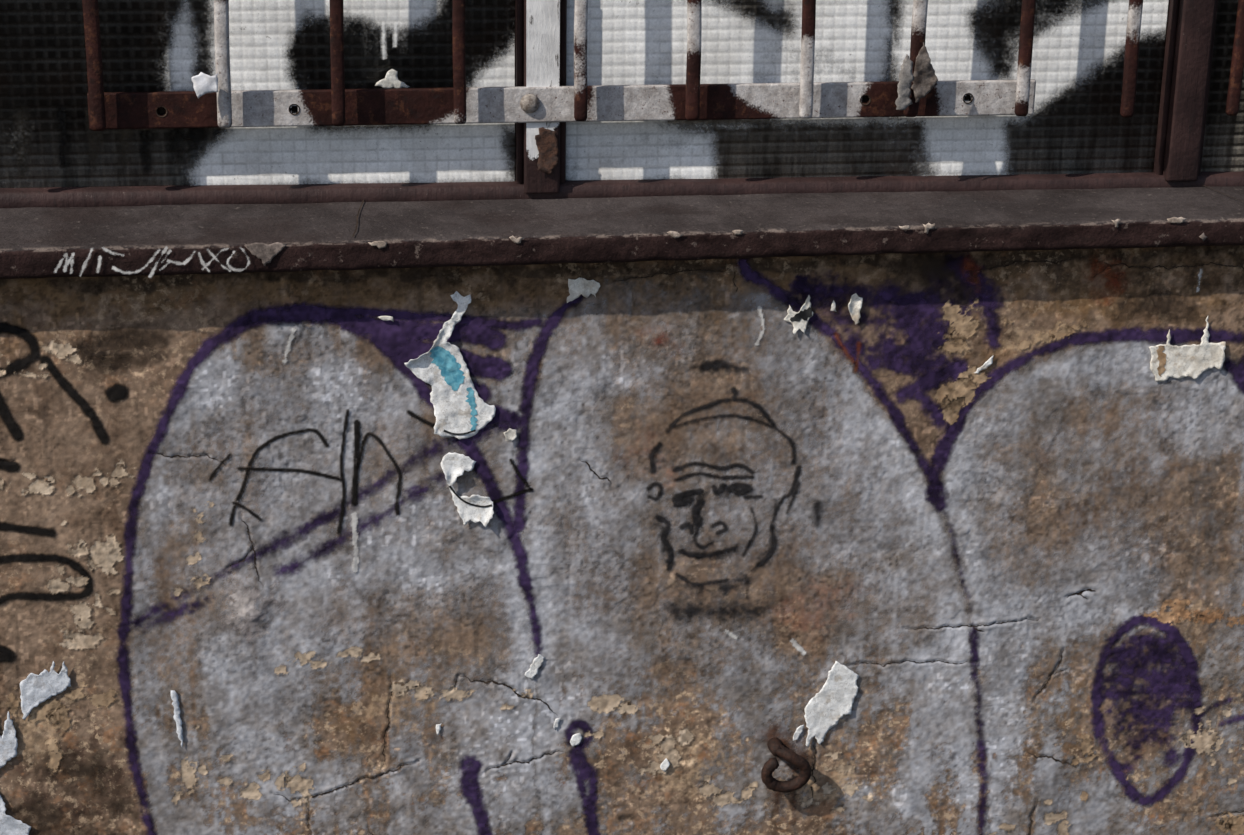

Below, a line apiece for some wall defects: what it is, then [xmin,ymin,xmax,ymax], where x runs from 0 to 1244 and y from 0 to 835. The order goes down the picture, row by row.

flaking render [934,299,989,425]
crack [846,659,968,667]
crack [907,618,1032,631]
flaking render [7,682,118,772]
crack [276,681,419,833]